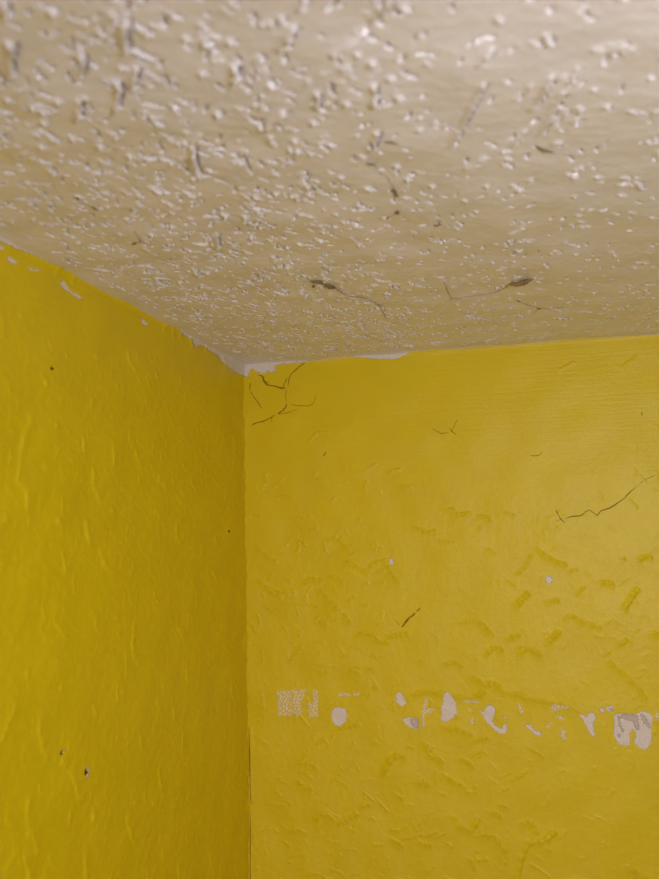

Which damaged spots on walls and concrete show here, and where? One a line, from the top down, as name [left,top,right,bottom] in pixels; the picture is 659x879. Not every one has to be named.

crack [249,362,316,425]
crack [556,476,653,522]
peeling [331,707,348,727]
peeling [403,717,418,729]
peeling [441,693,457,722]
peeling [480,705,507,734]
peeling [579,705,653,750]